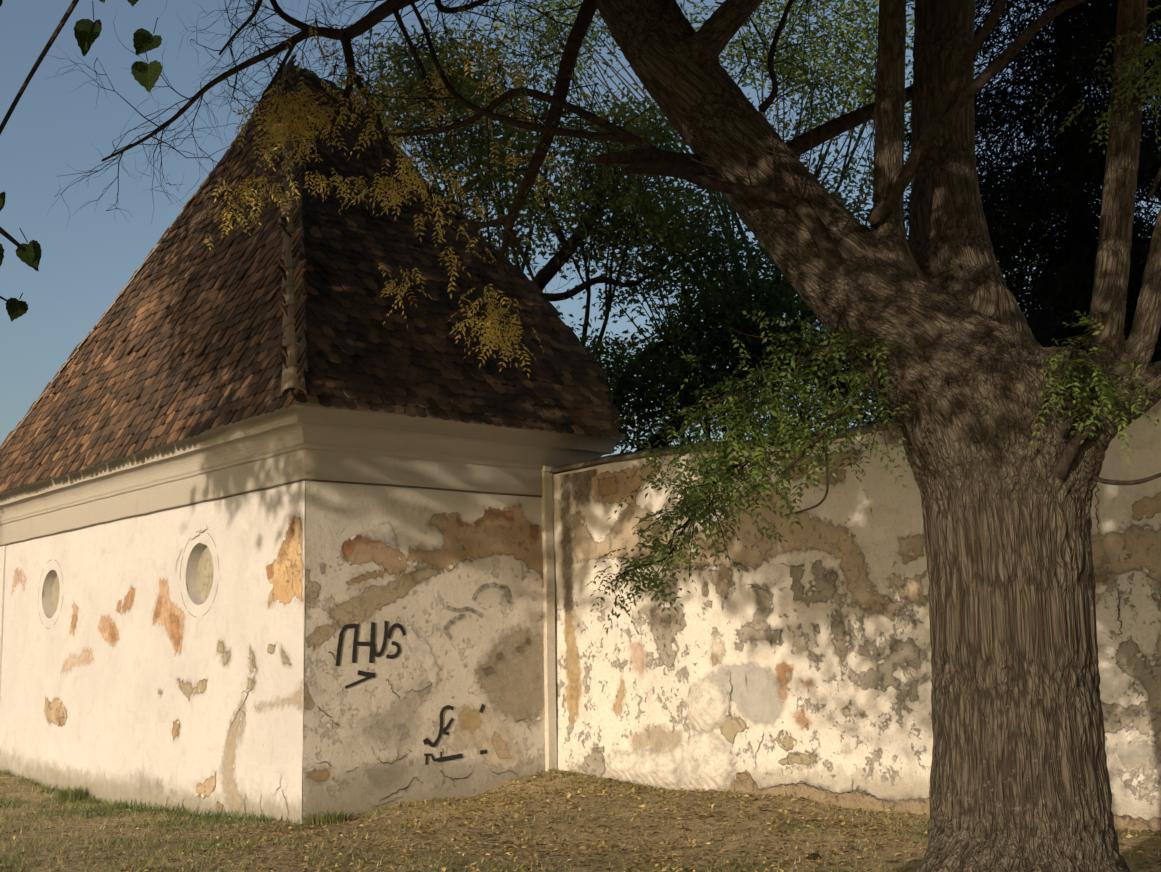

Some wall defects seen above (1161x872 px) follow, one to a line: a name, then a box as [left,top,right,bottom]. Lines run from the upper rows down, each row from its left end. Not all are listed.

spalling [266,516,325,609]
spalling [306,504,543,650]
water stain [560,469,597,618]
peeling [571,465,927,702]
peeling [1091,492,1161,604]
spalling [43,696,68,727]
peeling [217,640,232,665]
peeling [196,648,256,814]
peeling [268,644,292,666]
spalling [582,746,606,777]
peeling [716,712,750,743]
peeling [1101,635,1161,735]